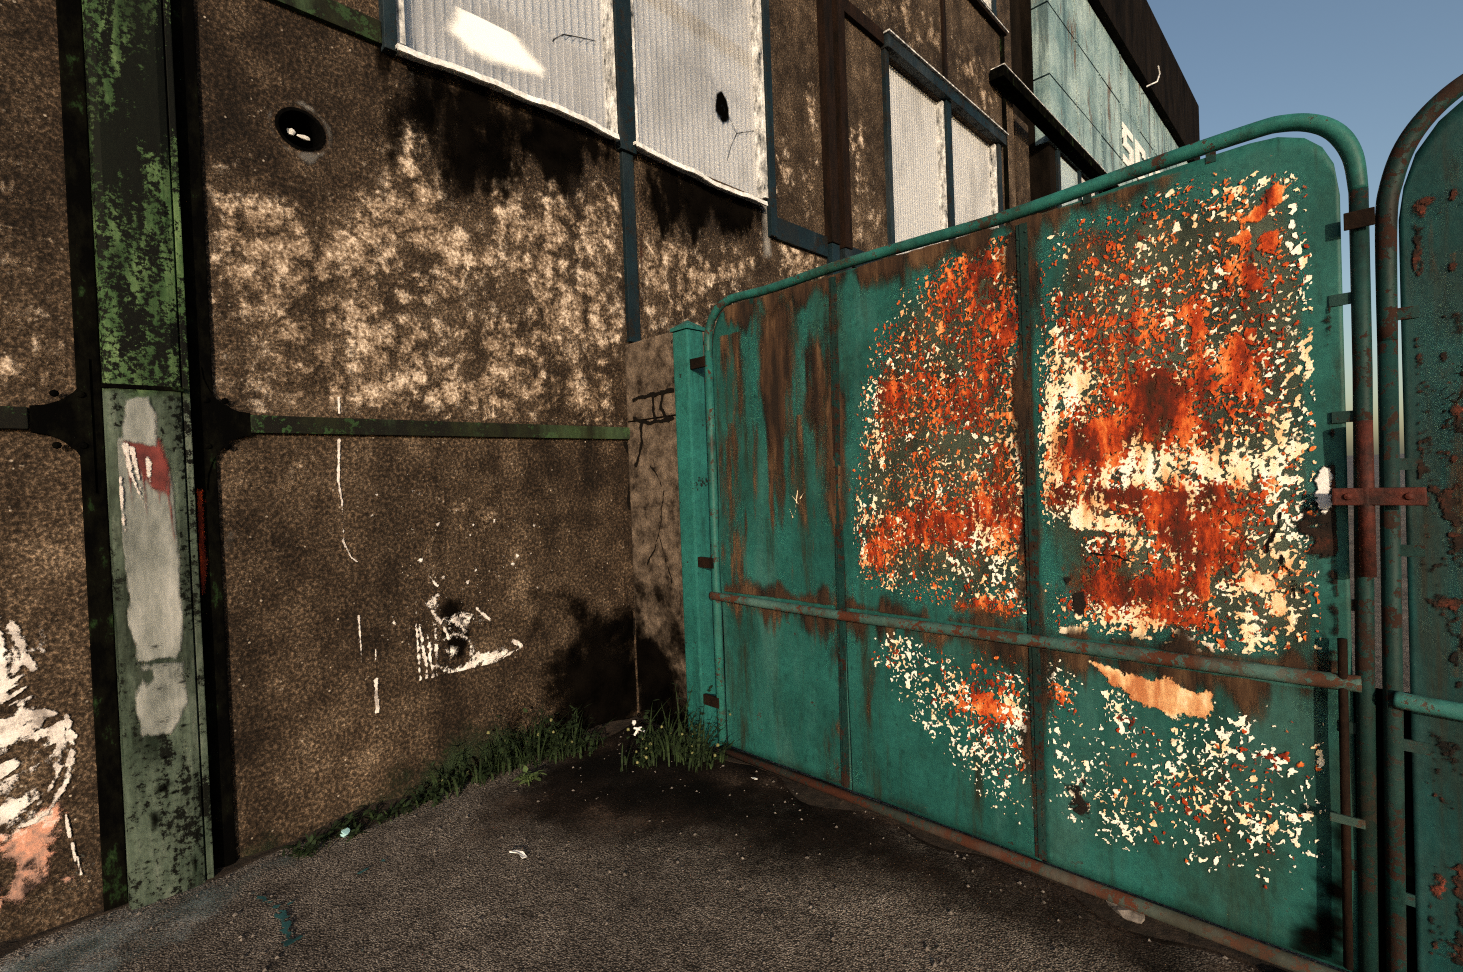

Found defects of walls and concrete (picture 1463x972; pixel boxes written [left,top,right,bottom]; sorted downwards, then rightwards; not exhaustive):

damp [643,164,771,256]
corrosion [1412,188,1457,293]
corrosion [719,173,1339,855]
corrosion [1415,337,1463,688]
damp [535,583,688,749]
peeling [874,632,1326,883]
corrosion [1429,864,1463,966]